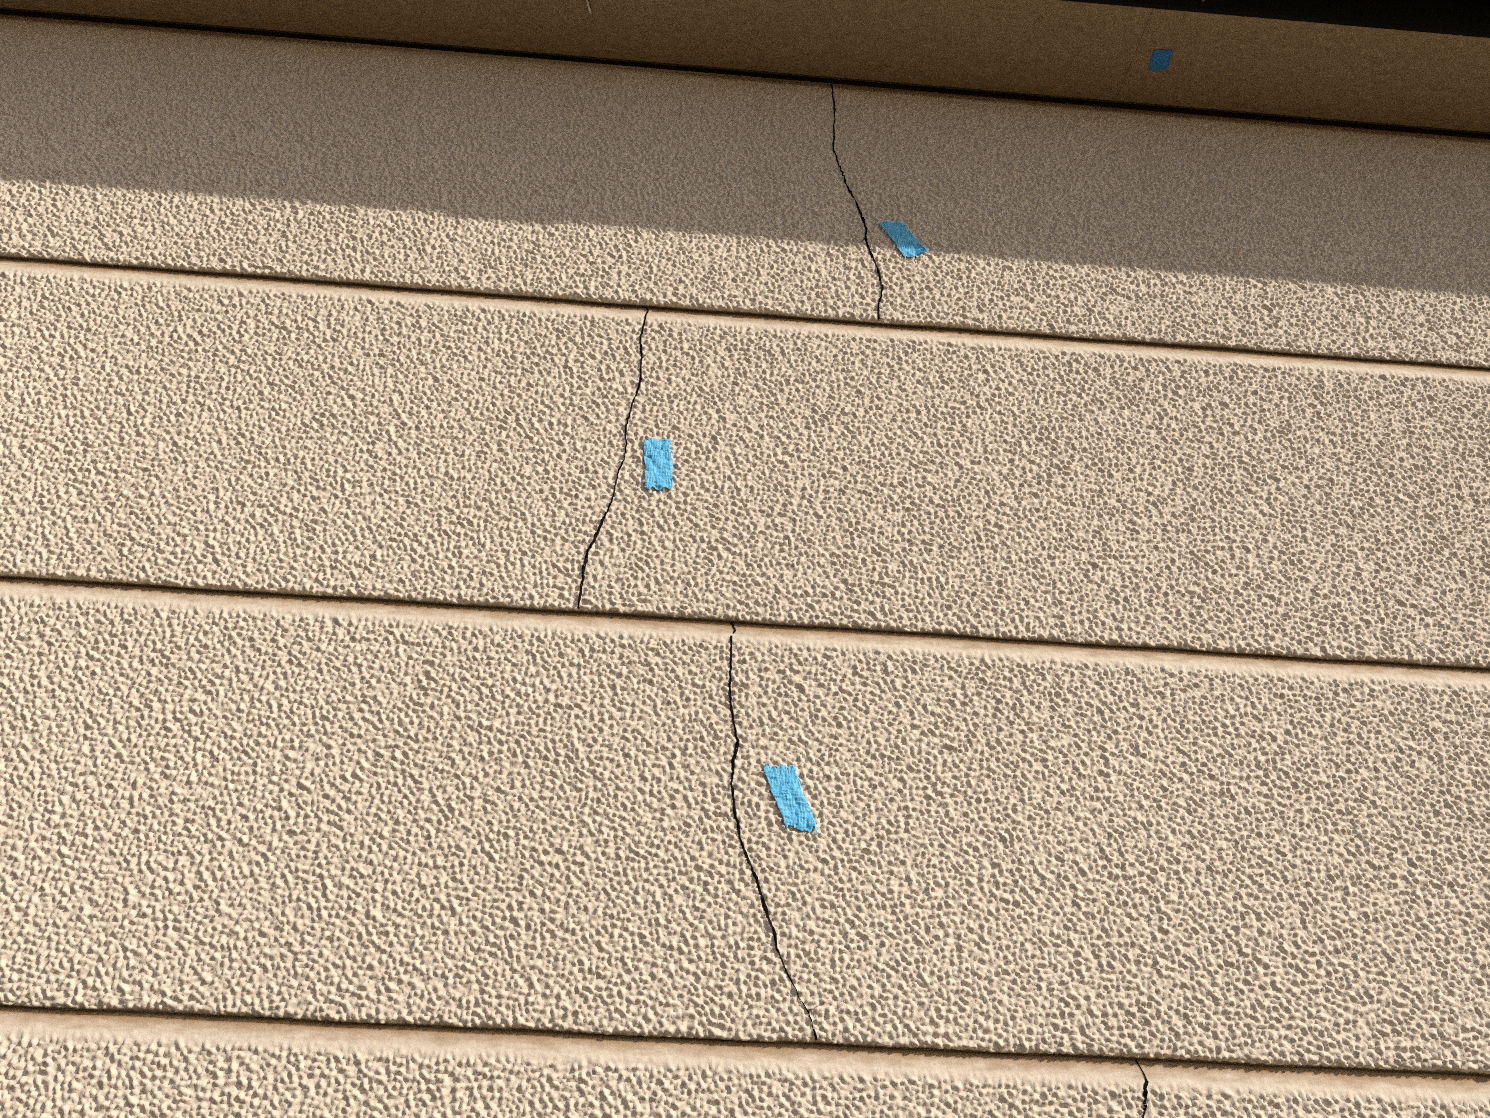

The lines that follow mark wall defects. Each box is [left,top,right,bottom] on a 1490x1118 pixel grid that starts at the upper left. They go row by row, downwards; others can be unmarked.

crack [830,84,884,320]
crack [577,307,649,609]
crack [728,622,826,1041]
crack [1135,1060,1149,1118]